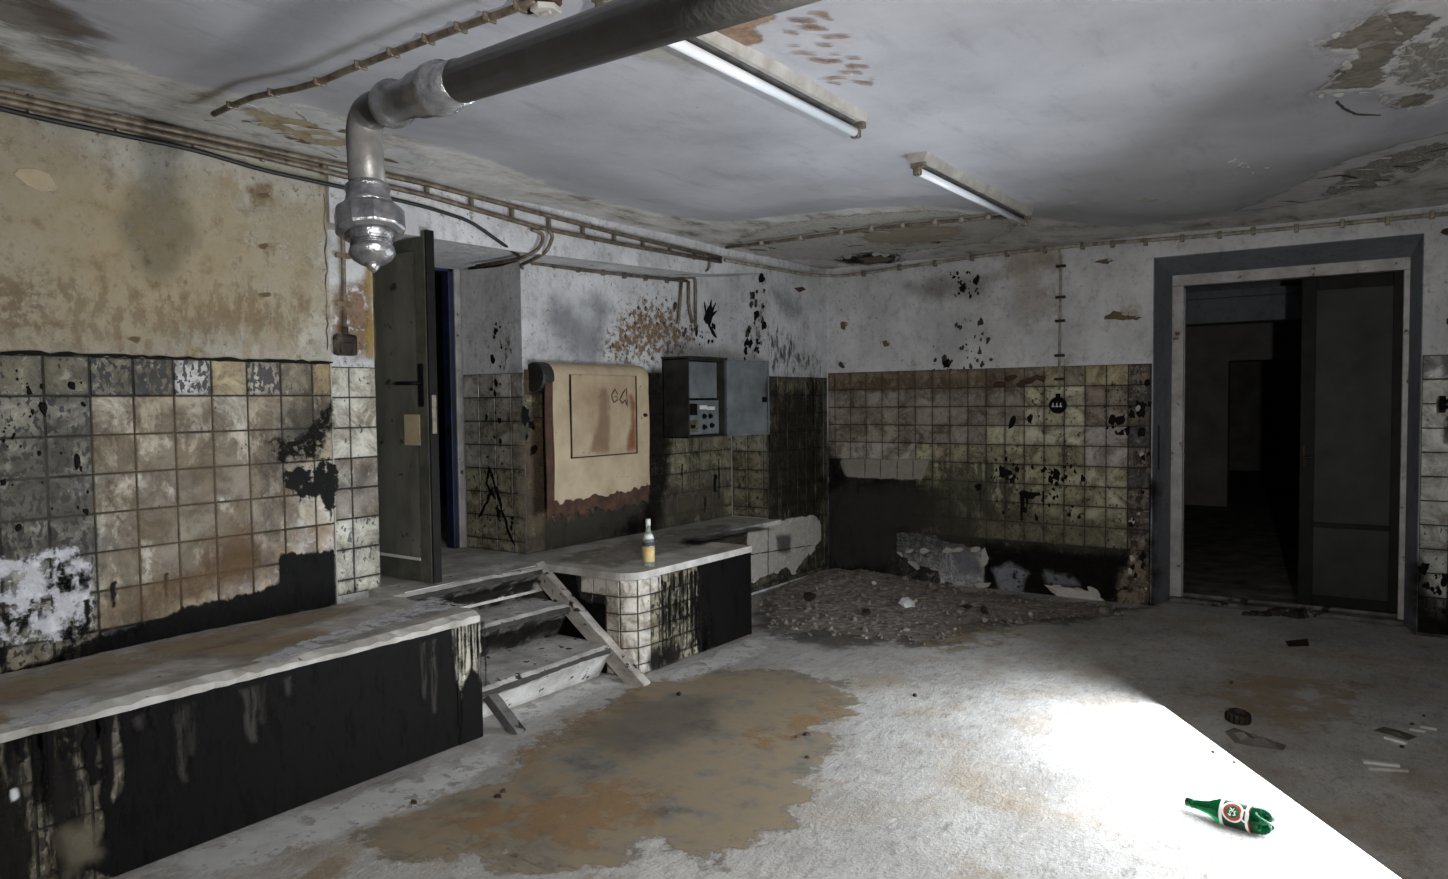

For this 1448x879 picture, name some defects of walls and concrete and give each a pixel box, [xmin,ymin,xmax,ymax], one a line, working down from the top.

peeling [1314,0,1448,116]
peeling [1235,133,1448,211]
water stain [0,126,319,343]
water stain [768,328,818,425]
spalling [896,532,991,588]
water stain [147,703,162,728]
water stain [0,715,117,839]